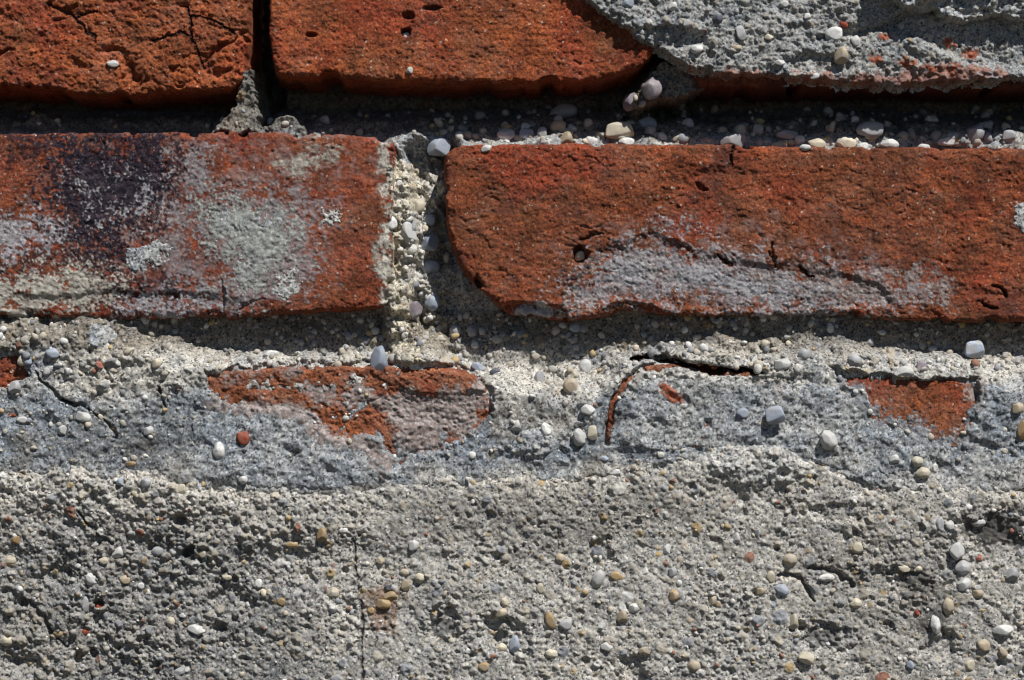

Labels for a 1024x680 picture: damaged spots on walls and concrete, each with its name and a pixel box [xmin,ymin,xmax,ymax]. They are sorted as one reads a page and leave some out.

crack [45,2,98,39]
crack [151,6,235,69]
crack [717,254,733,266]
crack [799,266,815,278]
crack [976,285,1008,309]
crack [629,356,761,374]
peeling [303,372,386,412]